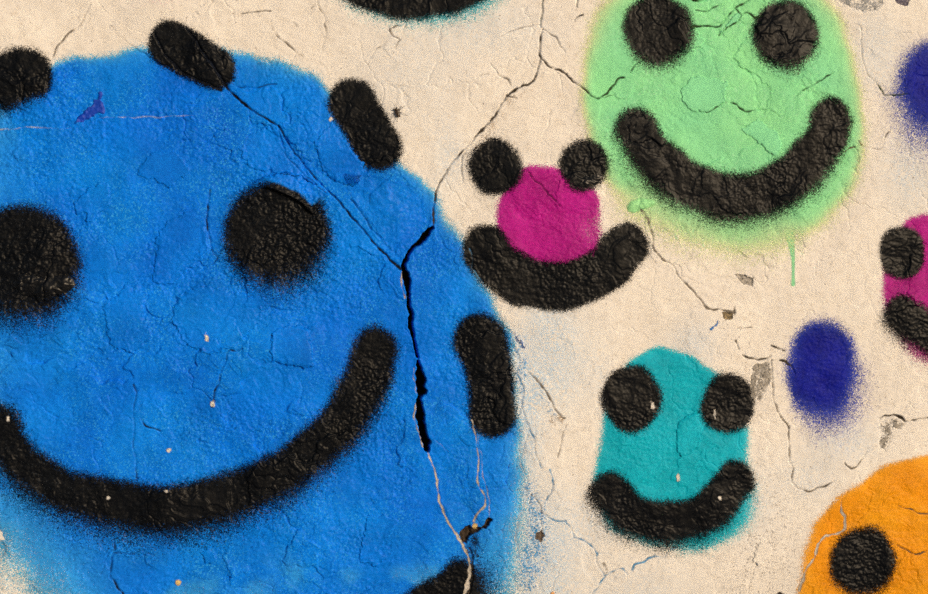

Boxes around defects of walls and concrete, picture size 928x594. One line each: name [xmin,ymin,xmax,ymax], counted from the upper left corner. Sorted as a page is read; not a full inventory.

crack [691,0,759,29]
flaking render [840,0,882,11]
crack [155,27,316,179]
crack [458,20,633,156]
crack [333,175,490,594]
crack [640,209,832,492]
flaking render [750,362,772,400]
crack [514,348,657,583]
crack [798,506,847,592]